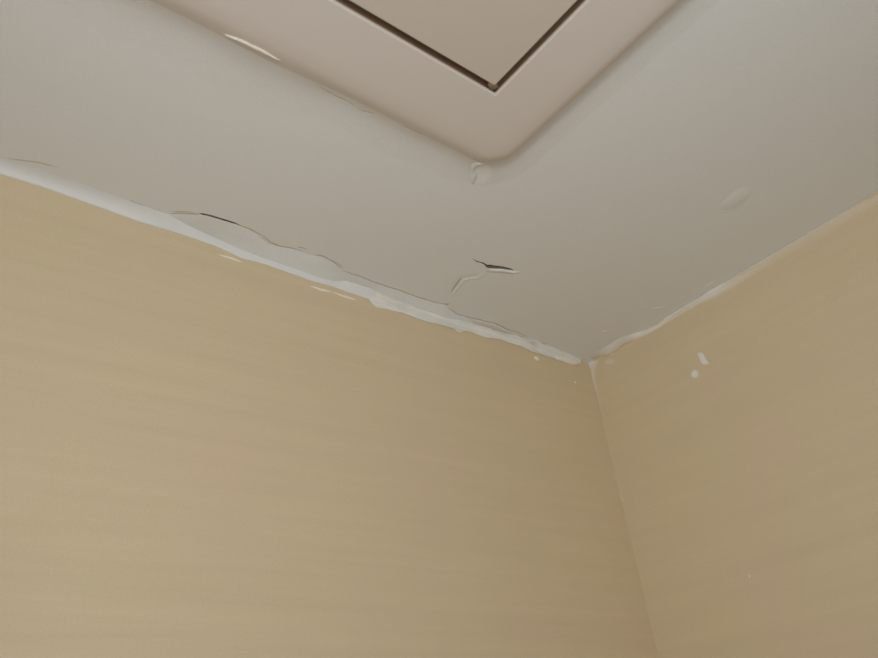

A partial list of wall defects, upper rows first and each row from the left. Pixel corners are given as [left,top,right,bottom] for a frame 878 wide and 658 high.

peeling [224,34,281,61]
crack [171,211,525,336]